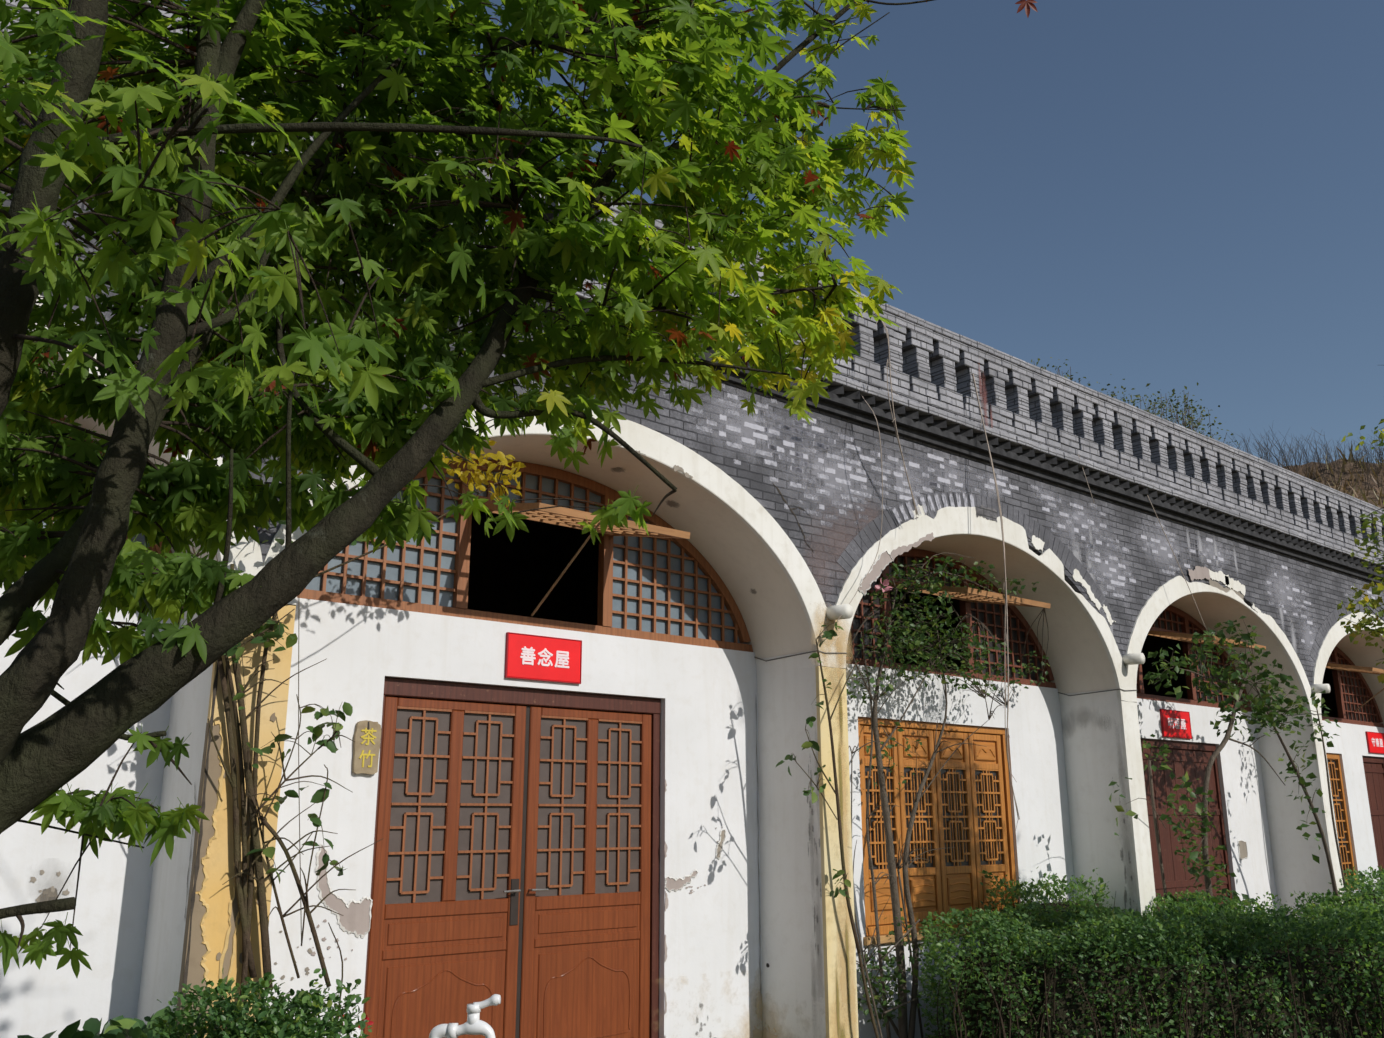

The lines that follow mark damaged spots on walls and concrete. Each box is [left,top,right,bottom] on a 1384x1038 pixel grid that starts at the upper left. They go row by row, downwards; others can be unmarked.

peeling [976,505,997,522]
peeling [859,532,934,595]
peeling [1031,535,1045,554]
peeling [1072,569,1116,625]
peeling [176,721,242,1038]
peeling [274,843,373,980]
peeling [665,869,706,911]